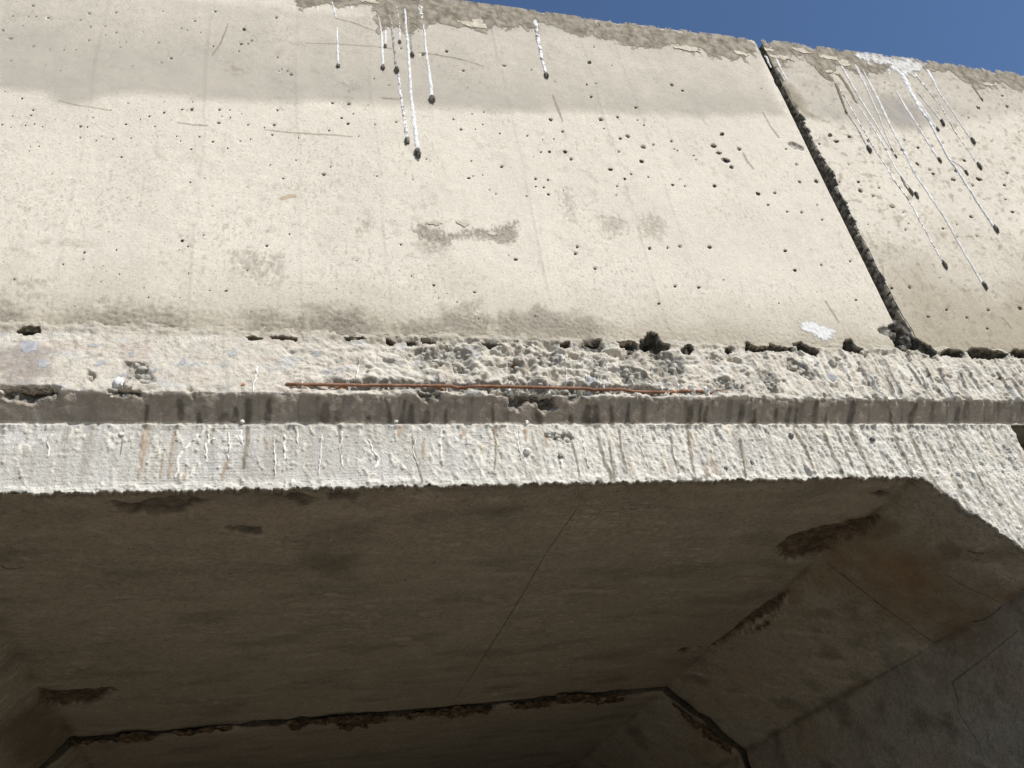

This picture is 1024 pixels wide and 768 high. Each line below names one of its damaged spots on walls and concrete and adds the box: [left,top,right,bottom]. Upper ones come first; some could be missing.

water stain [379,2,436,159]
crack [759,44,925,354]
water stain [815,52,1000,290]
peeling [0,329,58,402]
spalling [286,332,746,414]
spalling [745,343,837,380]
spalling [842,340,861,354]
spalling [877,324,1024,360]
water stain [385,397,430,482]
water stain [812,366,942,493]
water stain [907,365,991,498]
spalling [777,515,878,557]